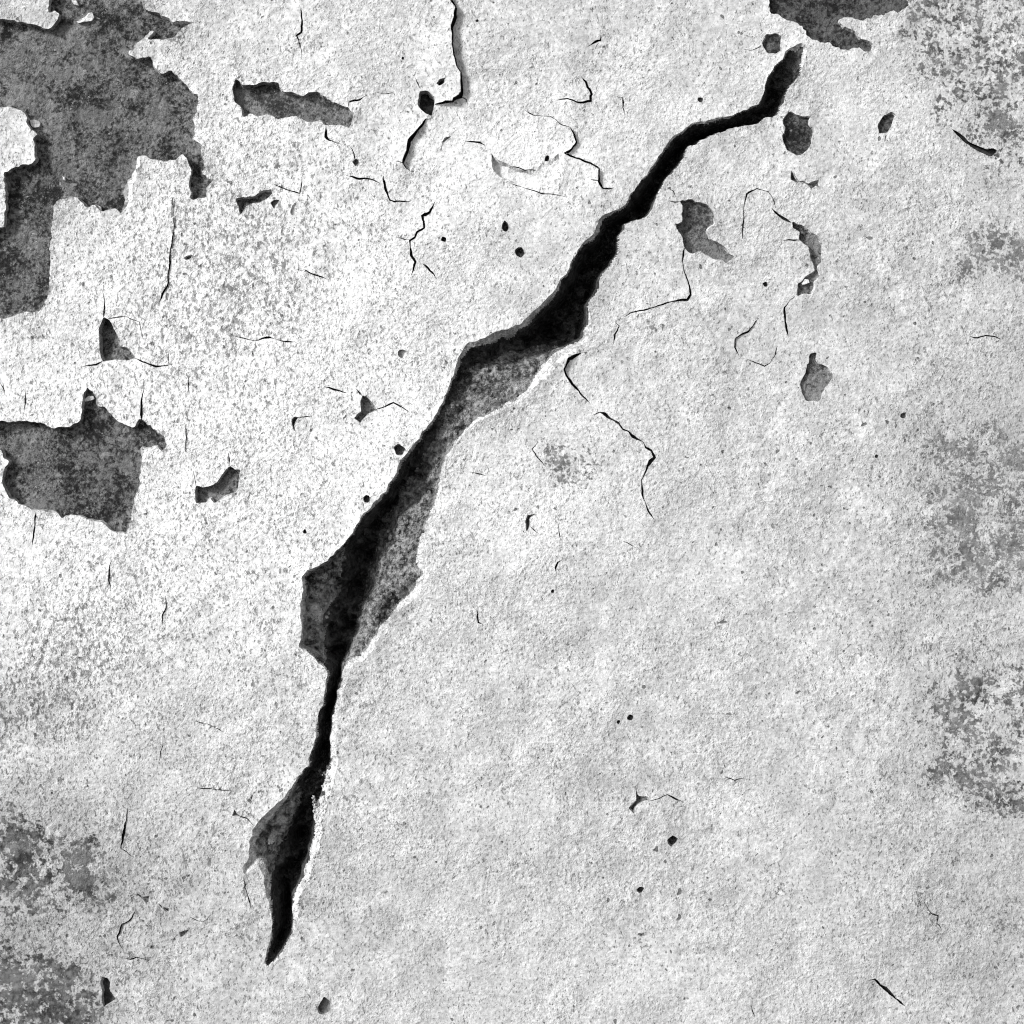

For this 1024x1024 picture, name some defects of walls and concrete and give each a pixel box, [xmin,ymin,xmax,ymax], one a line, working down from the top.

flaking render [769,0,910,52]
flaking render [0,0,213,319]
flaking render [232,77,367,165]
crack [346,0,468,279]
spalling [782,111,814,156]
spalling [83,291,172,368]
crack [232,334,293,342]
flaking render [613,188,734,344]
flaking render [742,188,823,335]
flaking render [0,379,167,544]
spalling [193,453,240,503]
crack [243,43,807,968]